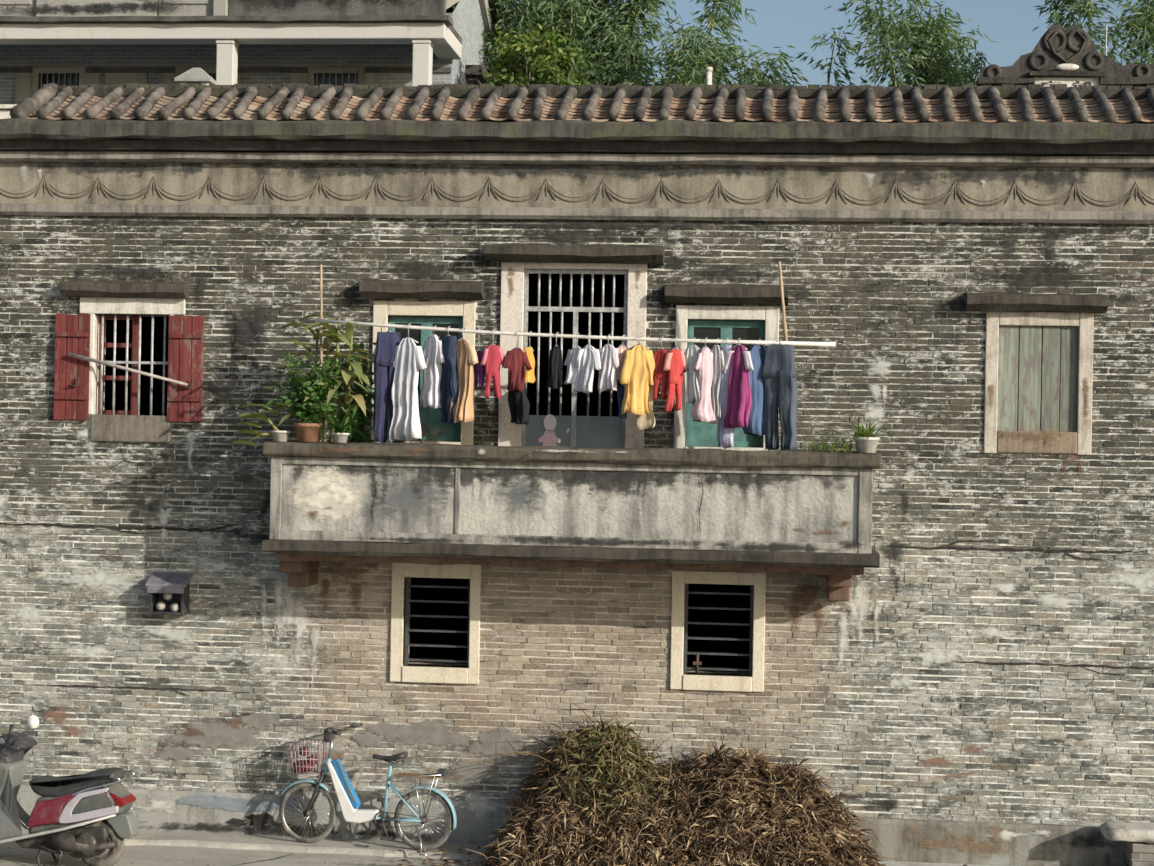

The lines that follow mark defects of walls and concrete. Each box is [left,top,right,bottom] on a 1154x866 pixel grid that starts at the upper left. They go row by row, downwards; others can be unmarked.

damp [22,162,202,182]
damp [295,163,786,185]
damp [865,167,1088,193]
damp [1125,167,1154,178]
damp [411,427,442,452]
damp [293,448,844,520]
crack [0,523,255,534]
damp [502,536,702,548]
damp [721,543,818,552]
crack [878,540,1146,561]
corrosion [790,586,823,629]